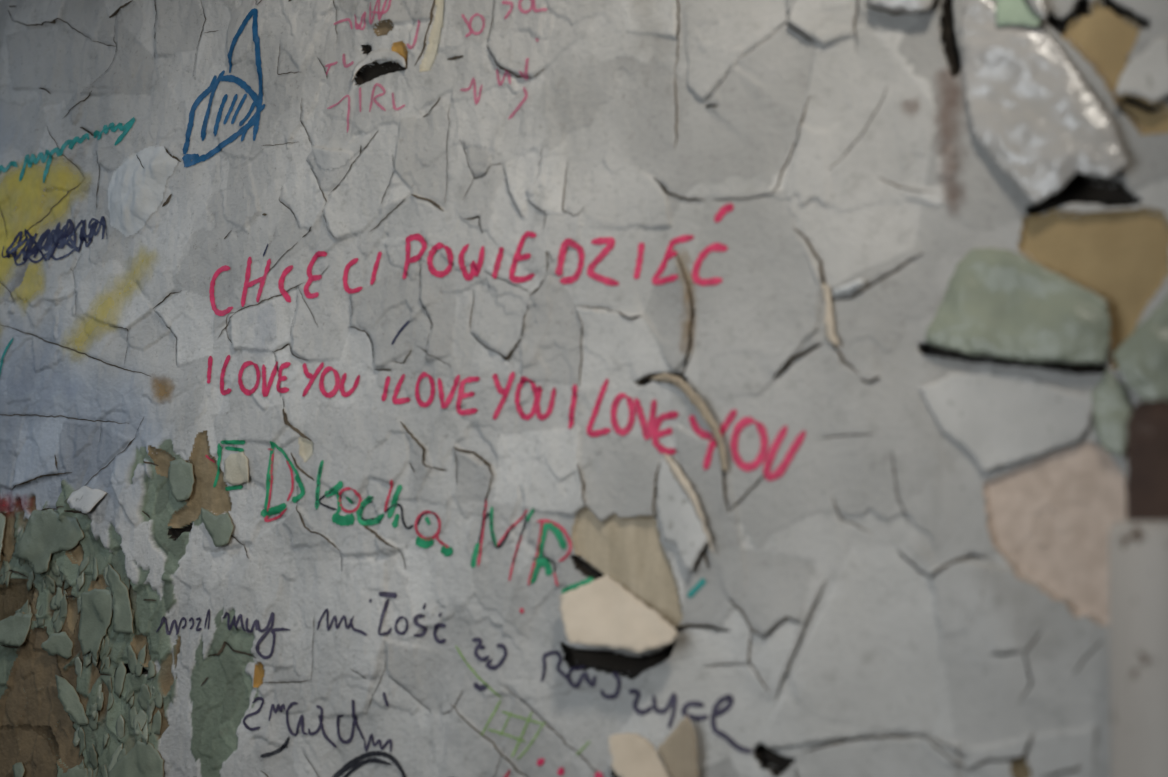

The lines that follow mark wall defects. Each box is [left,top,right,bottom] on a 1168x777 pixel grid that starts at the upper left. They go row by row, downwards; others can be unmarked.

flaking render [352,0,444,82]
crack [415,0,544,79]
crack [218,97,586,572]
crack [634,248,695,385]
crack [773,343,880,383]
peeling [919,0,1168,626]
crack [0,414,159,515]
flaking render [148,431,249,547]
flaking render [559,453,715,653]
flaking render [0,486,164,777]
flaking render [253,662,265,688]
crack [675,580,827,702]